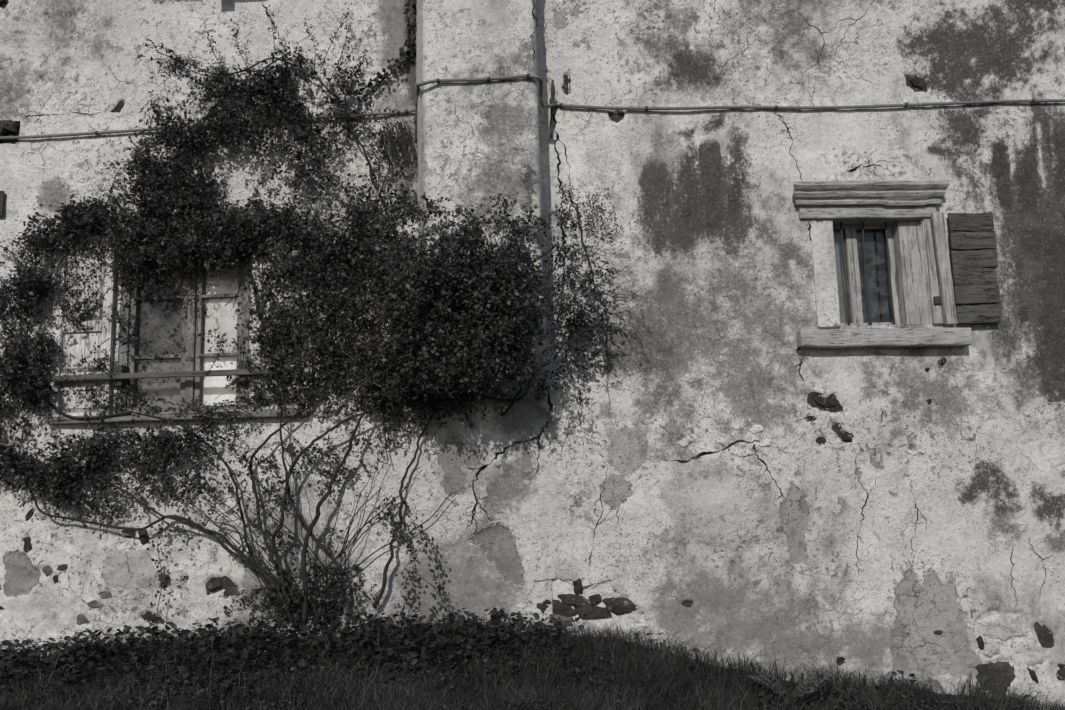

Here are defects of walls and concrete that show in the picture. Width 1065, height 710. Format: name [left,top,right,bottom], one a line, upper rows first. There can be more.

crack [530,0,538,60]
water stain [646,0,728,98]
water stain [897,0,1065,410]
water stain [609,113,824,459]
crack [469,390,583,533]
crack [664,425,792,543]
spalling [805,387,854,445]
water stain [957,461,1065,529]
flaking render [0,536,68,610]
flaking render [468,520,650,634]
flaking render [890,562,1054,702]
flaking render [1056,664,1065,681]